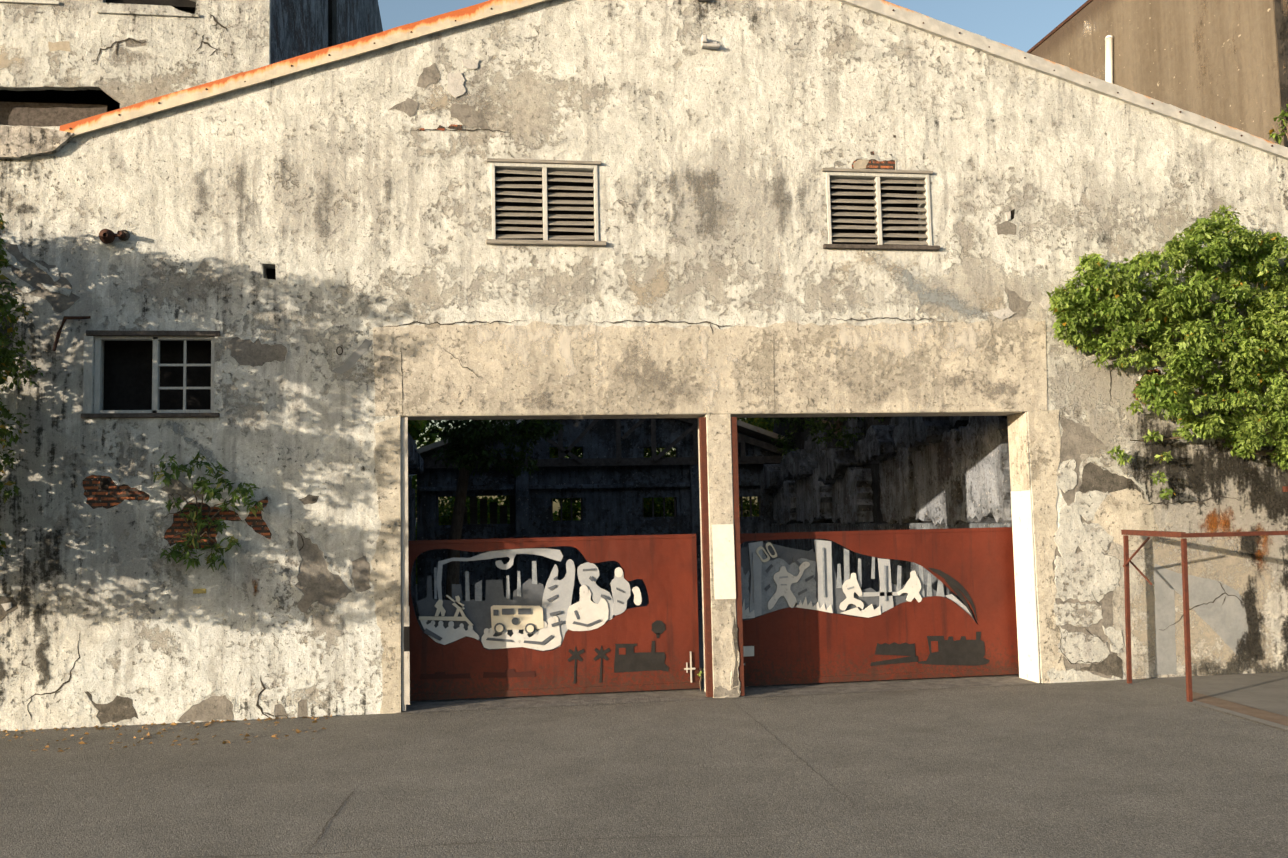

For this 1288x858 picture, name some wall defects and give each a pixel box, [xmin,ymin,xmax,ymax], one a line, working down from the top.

peeling [389,59,491,131]
crack [586,320,740,333]
crack [829,315,951,323]
water stain [39,528,64,576]
flaking render [79,471,276,554]
flaking render [291,532,374,614]
flaking render [1047,415,1152,683]
crack [1159,582,1244,631]
water stain [1127,410,1288,679]
water stain [32,604,52,688]
flaking render [82,691,138,727]
flaking render [178,692,236,723]